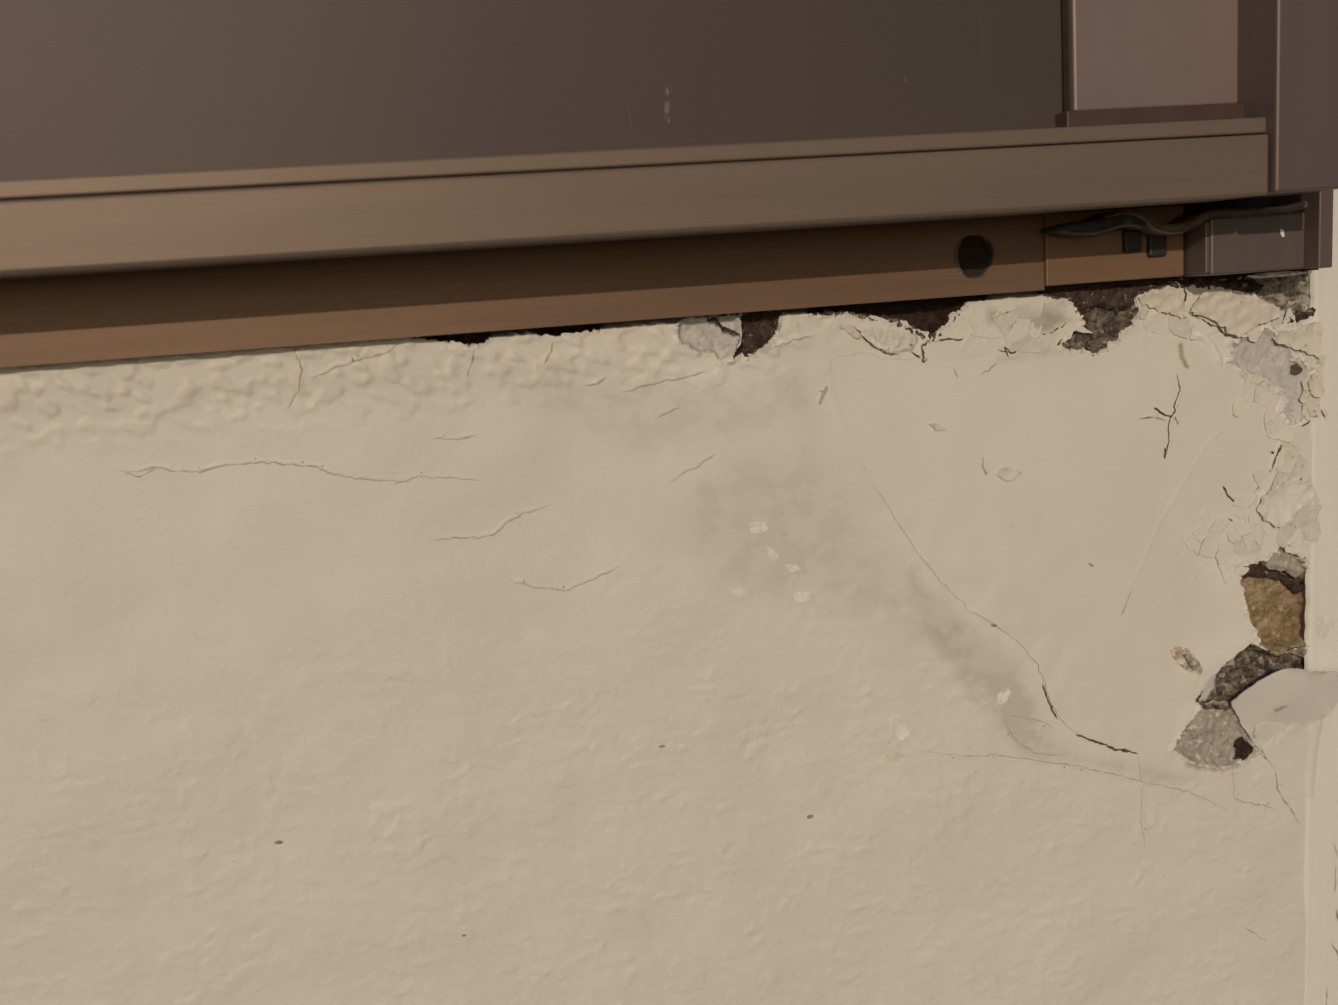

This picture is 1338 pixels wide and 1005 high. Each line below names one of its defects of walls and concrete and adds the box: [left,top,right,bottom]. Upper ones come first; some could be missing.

spalling [672,310,785,368]
crack [288,343,399,407]
crack [583,368,709,419]
crack [1136,281,1328,584]
crack [115,457,476,485]
crack [433,503,551,541]
peeling [807,291,1323,771]
crack [510,565,623,592]